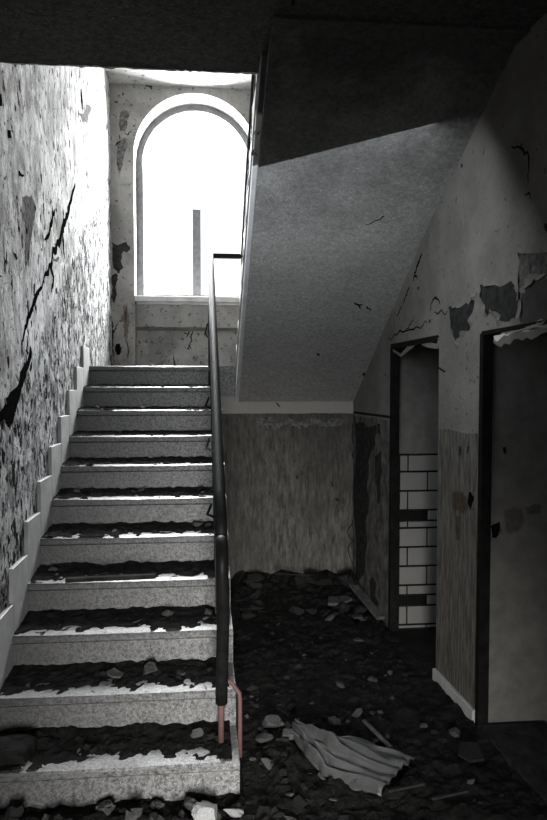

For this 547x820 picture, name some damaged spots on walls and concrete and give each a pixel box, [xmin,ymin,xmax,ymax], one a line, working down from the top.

crack [21,184,76,346]
peeling [111,240,132,302]
crack [388,253,448,341]
spalling [448,244,547,349]